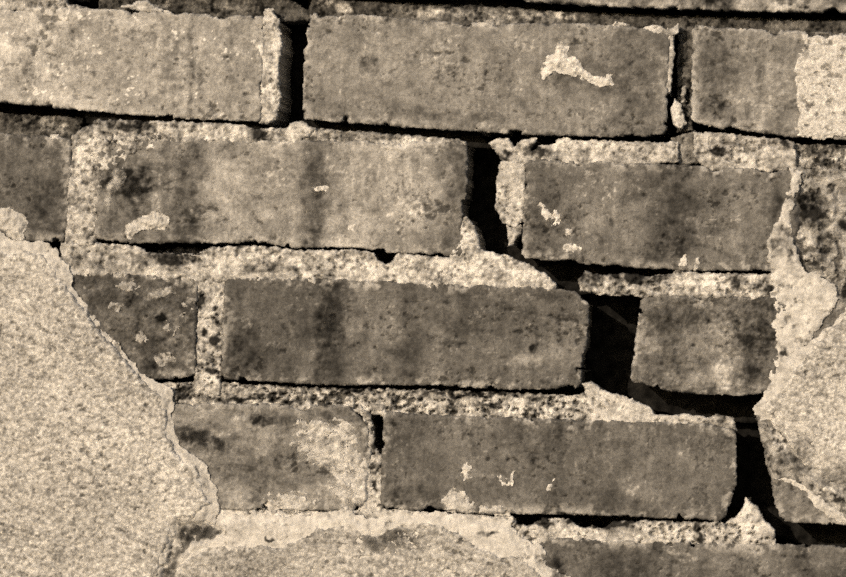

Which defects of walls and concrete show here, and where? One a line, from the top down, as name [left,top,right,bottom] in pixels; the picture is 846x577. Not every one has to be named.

crack [164,526,208,577]
flaking render [0,231,571,577]
crack [289,0,846,548]
flaking render [753,166,846,524]